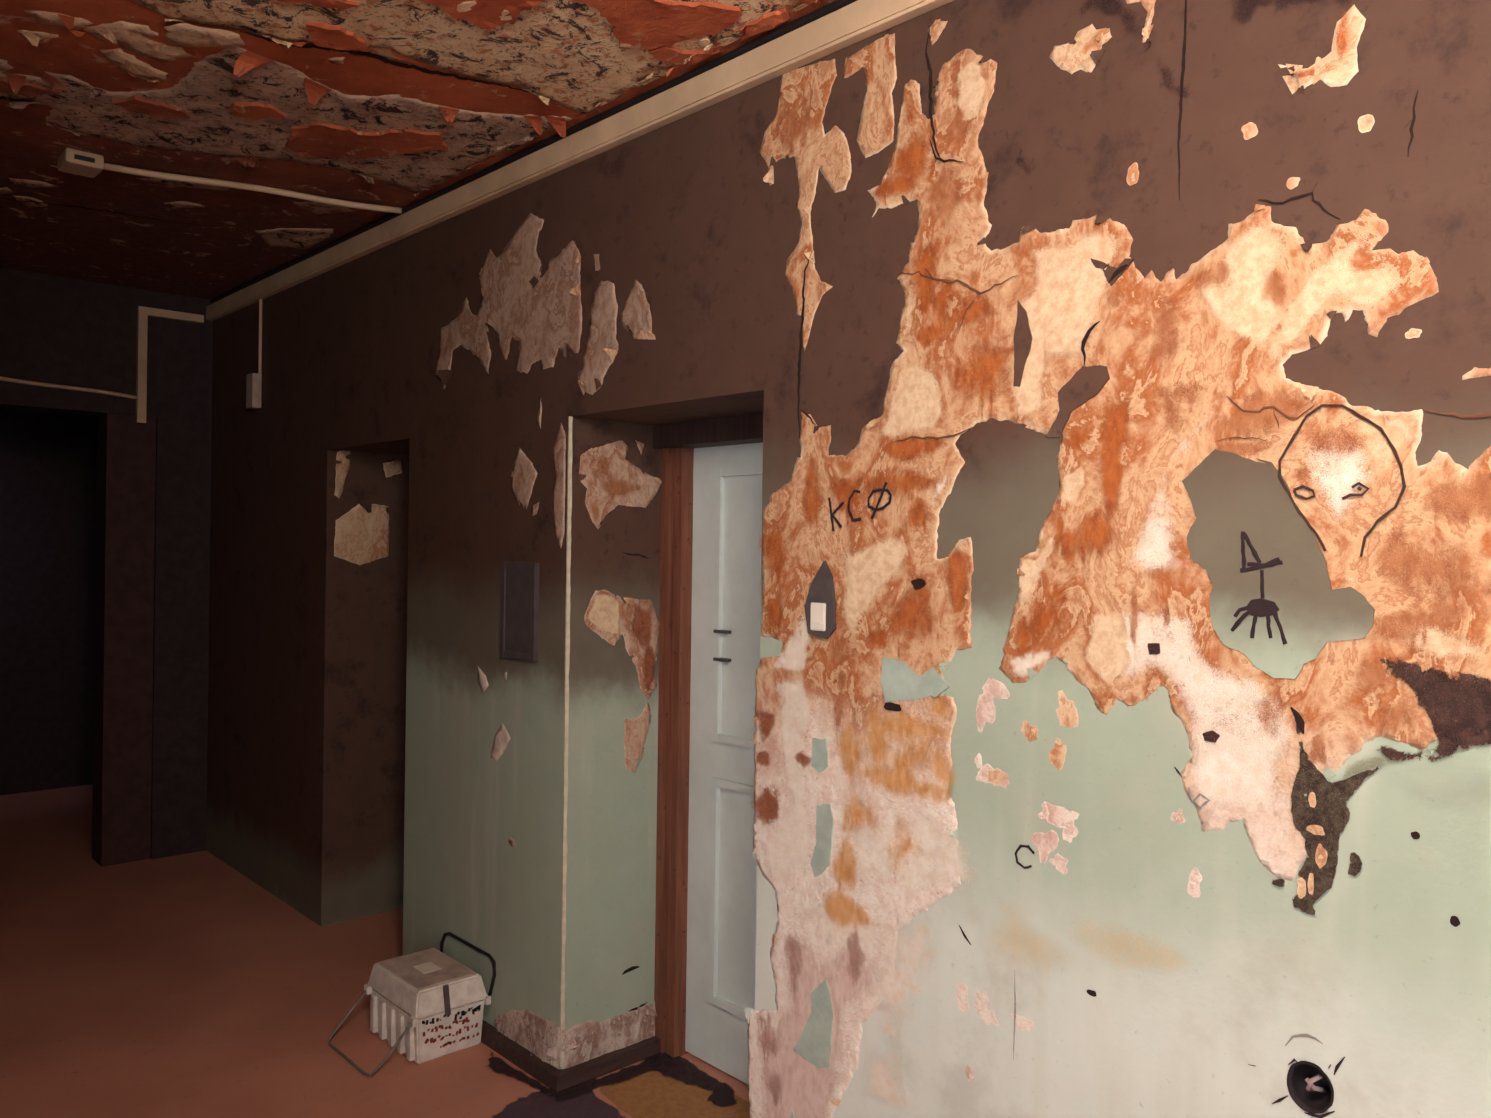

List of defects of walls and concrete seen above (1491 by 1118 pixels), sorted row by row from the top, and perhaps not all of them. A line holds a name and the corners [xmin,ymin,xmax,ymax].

peeling [1050,24,1112,74]
peeling [1278,5,1366,94]
peeling [0,0,819,197]
peeling [0,165,58,208]
peeling [434,213,656,395]
peeling [334,450,390,565]
peeling [383,460,402,478]
peeling [744,33,1491,1118]
peeling [584,590,660,773]
leakage [1340,755,1402,779]
flaking render [494,1002,657,1069]
leakage [491,1088,626,1118]